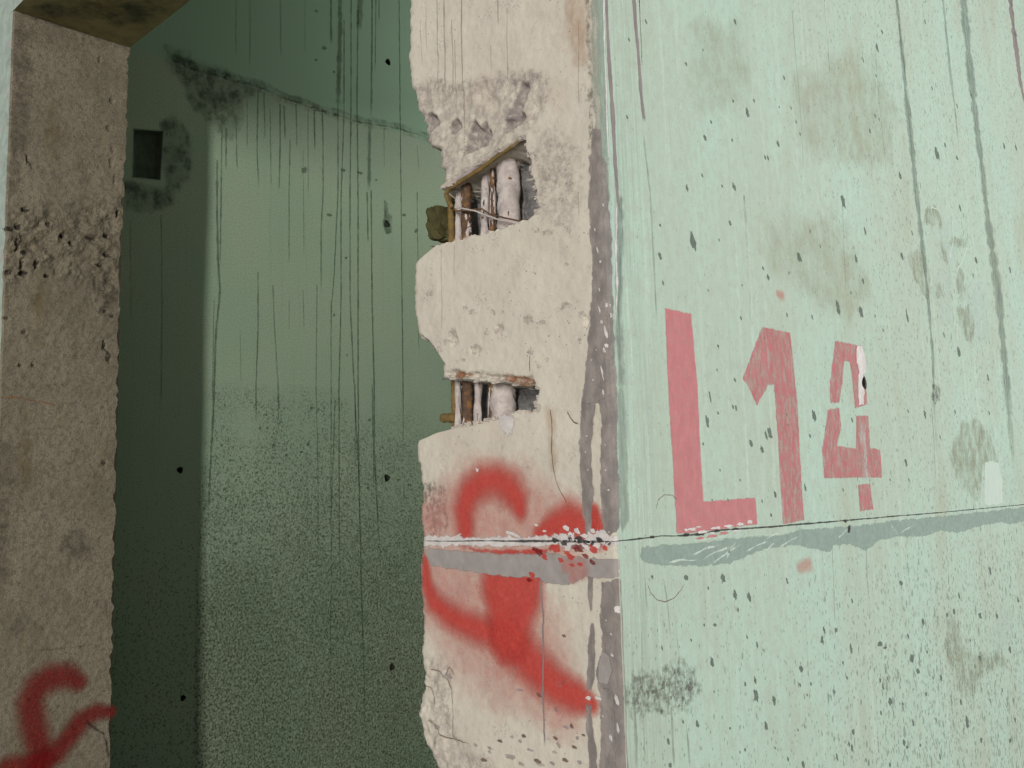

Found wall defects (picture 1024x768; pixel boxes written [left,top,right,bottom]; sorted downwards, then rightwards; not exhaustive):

spalling [440,119,505,200]
spalling [506,84,542,226]
spalling [454,175,498,241]
leakage [350,198,402,308]
spalling [449,372,541,429]
crack [436,504,1024,546]